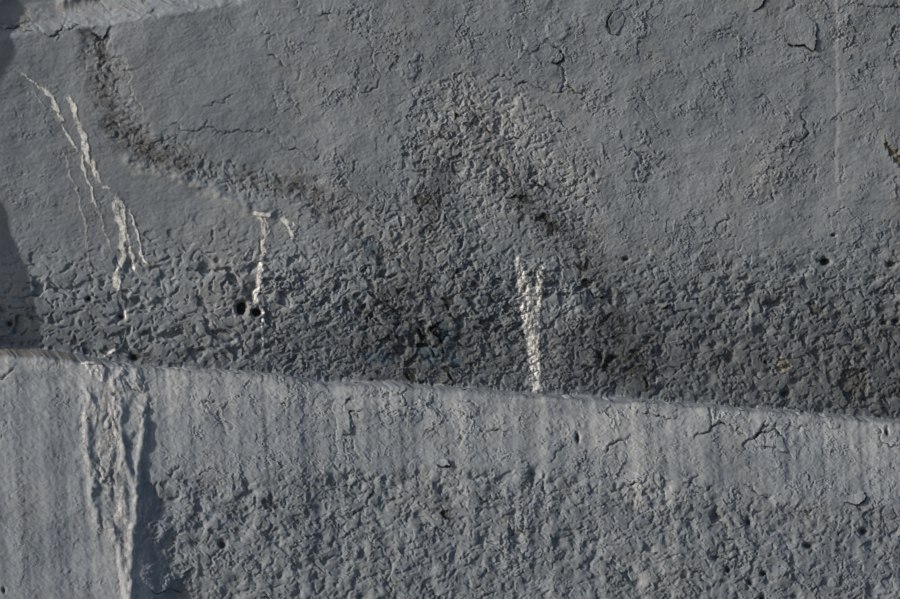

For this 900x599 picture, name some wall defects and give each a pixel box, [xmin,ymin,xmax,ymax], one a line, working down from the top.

crack [0,20,142,115]
crack [491,0,586,123]
crack [451,86,520,187]
crack [759,94,809,149]
spalling [884,139,900,166]
damp [506,182,601,250]
damp [22,73,148,599]
efflorescence [253,211,295,347]
damp [514,257,545,394]
damp [576,259,625,327]
damp [583,333,656,395]
crack [694,405,841,476]